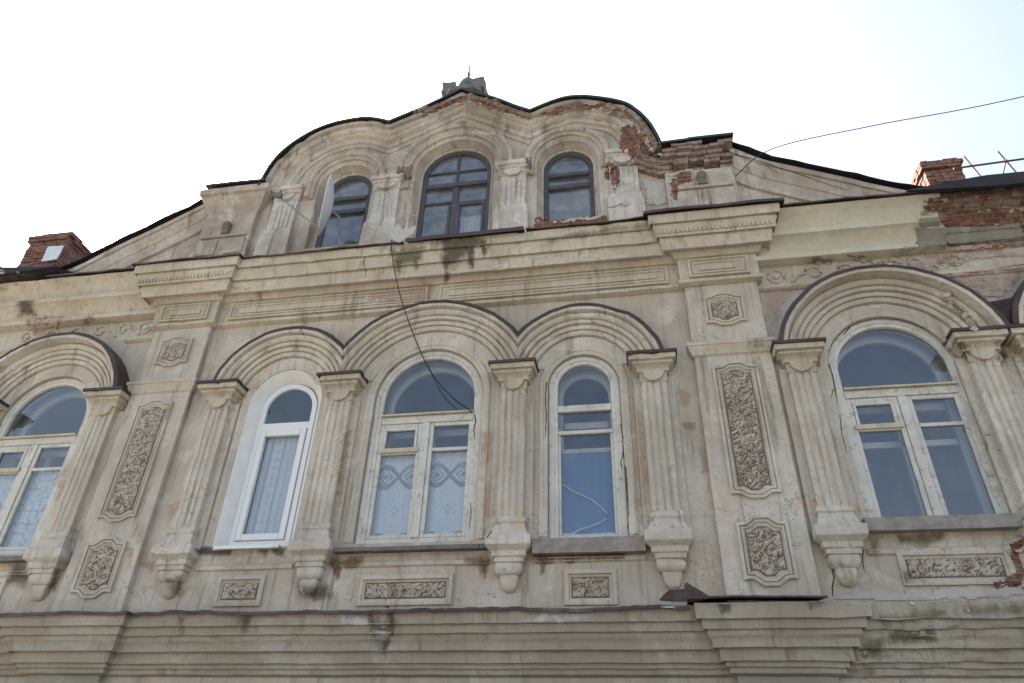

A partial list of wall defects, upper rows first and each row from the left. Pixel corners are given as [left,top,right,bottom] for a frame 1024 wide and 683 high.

spalling [413,93,662,223]
spalling [668,169,694,201]
leakage [439,236,486,281]
spalling [854,194,1024,331]
crack [829,364,847,452]
crack [620,424,629,530]
peeling [835,534,1024,605]